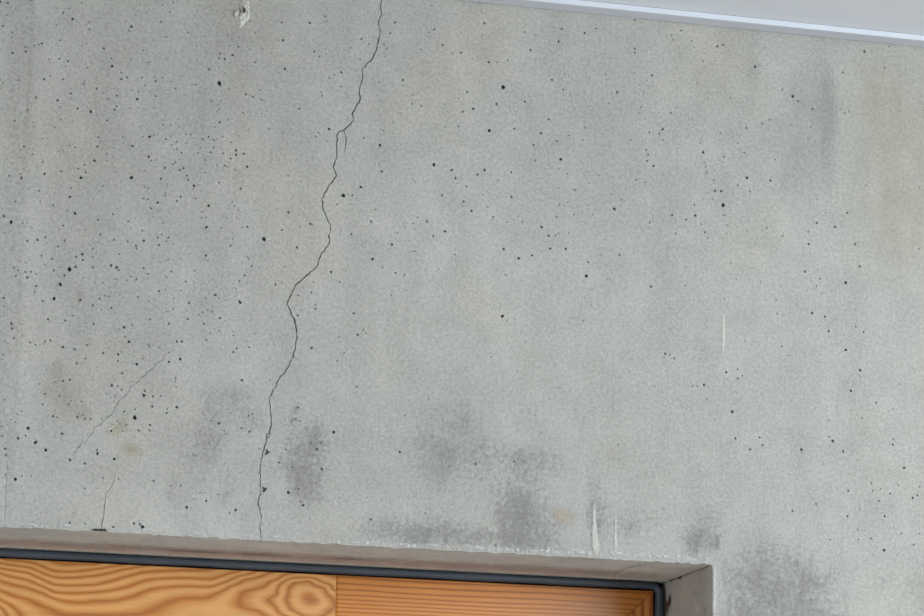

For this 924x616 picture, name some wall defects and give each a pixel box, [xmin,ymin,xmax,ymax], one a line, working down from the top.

crack [258,0,382,542]
damp [568,508,598,554]